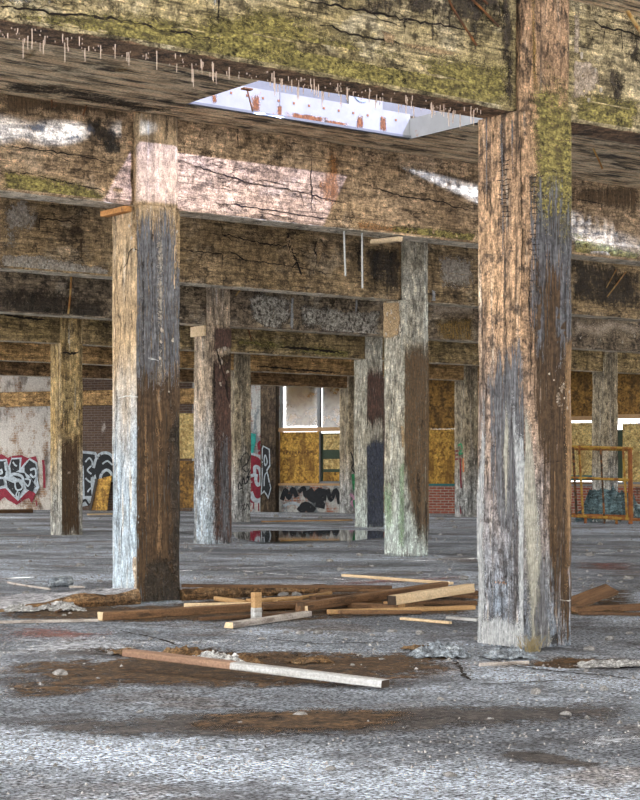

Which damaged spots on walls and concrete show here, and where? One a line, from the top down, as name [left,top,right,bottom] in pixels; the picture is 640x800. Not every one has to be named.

crack [1,0,220,42]
corrosion [278,106,347,125]
crack [114,160,347,400]
crack [453,658,640,684]